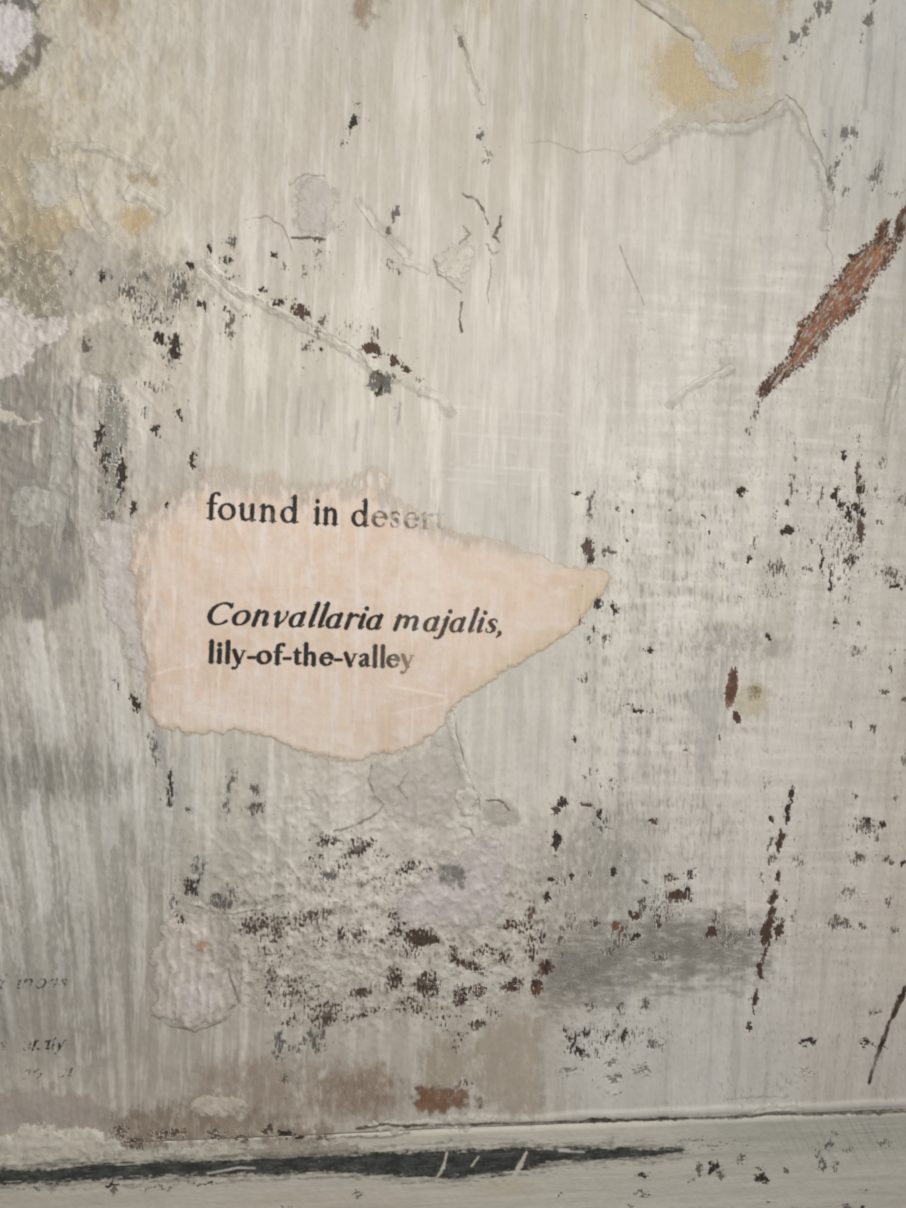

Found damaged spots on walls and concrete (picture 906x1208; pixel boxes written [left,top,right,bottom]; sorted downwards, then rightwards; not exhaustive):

crack [624,0,836,231]
peeling [551,796,608,832]
peeling [551,830,562,857]
peeling [149,835,591,1060]
peeling [591,870,696,956]
peeling [706,913,731,946]
corrosion [414,1086,482,1113]